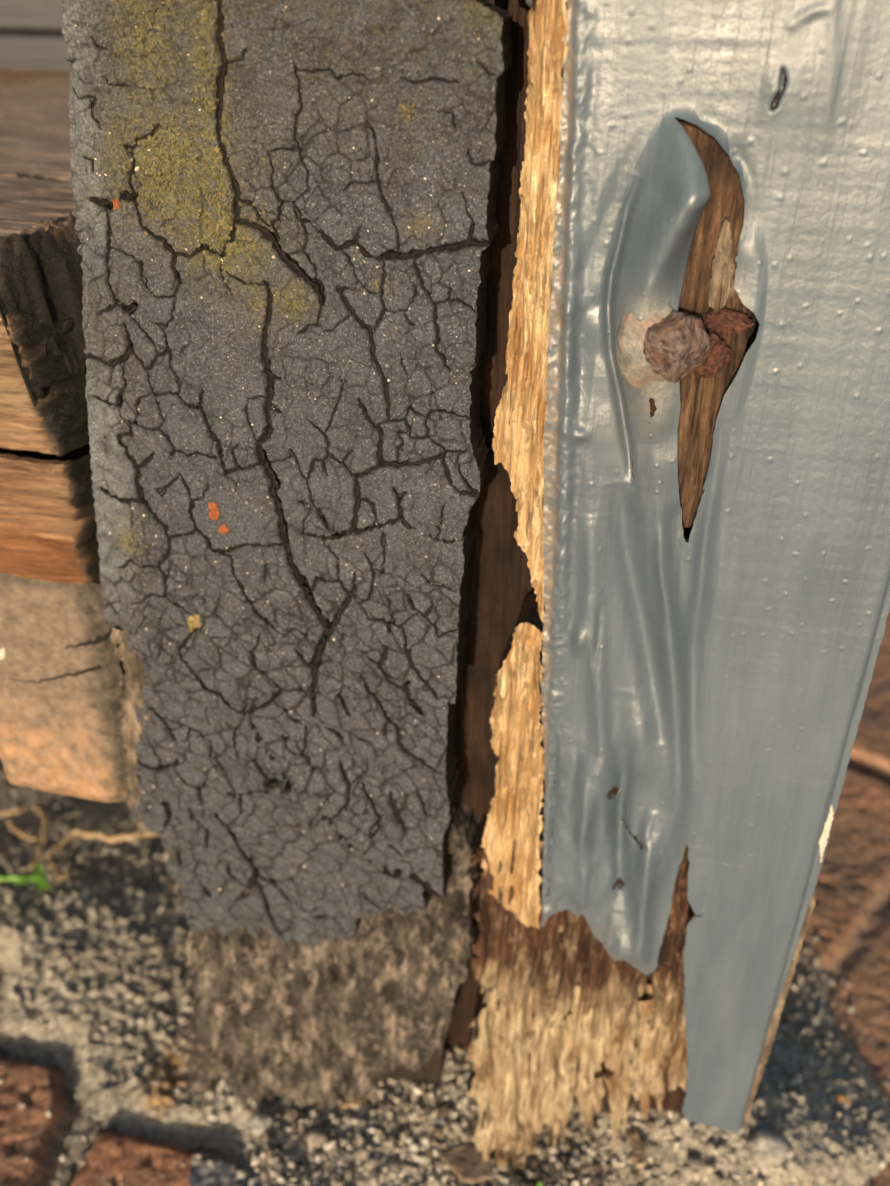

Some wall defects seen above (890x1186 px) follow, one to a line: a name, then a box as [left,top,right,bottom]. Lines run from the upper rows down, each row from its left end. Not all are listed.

crack [66,36,133,129]
corrosion [208,502,230,534]
crack [83,0,495,937]
spalling [676,117,752,528]